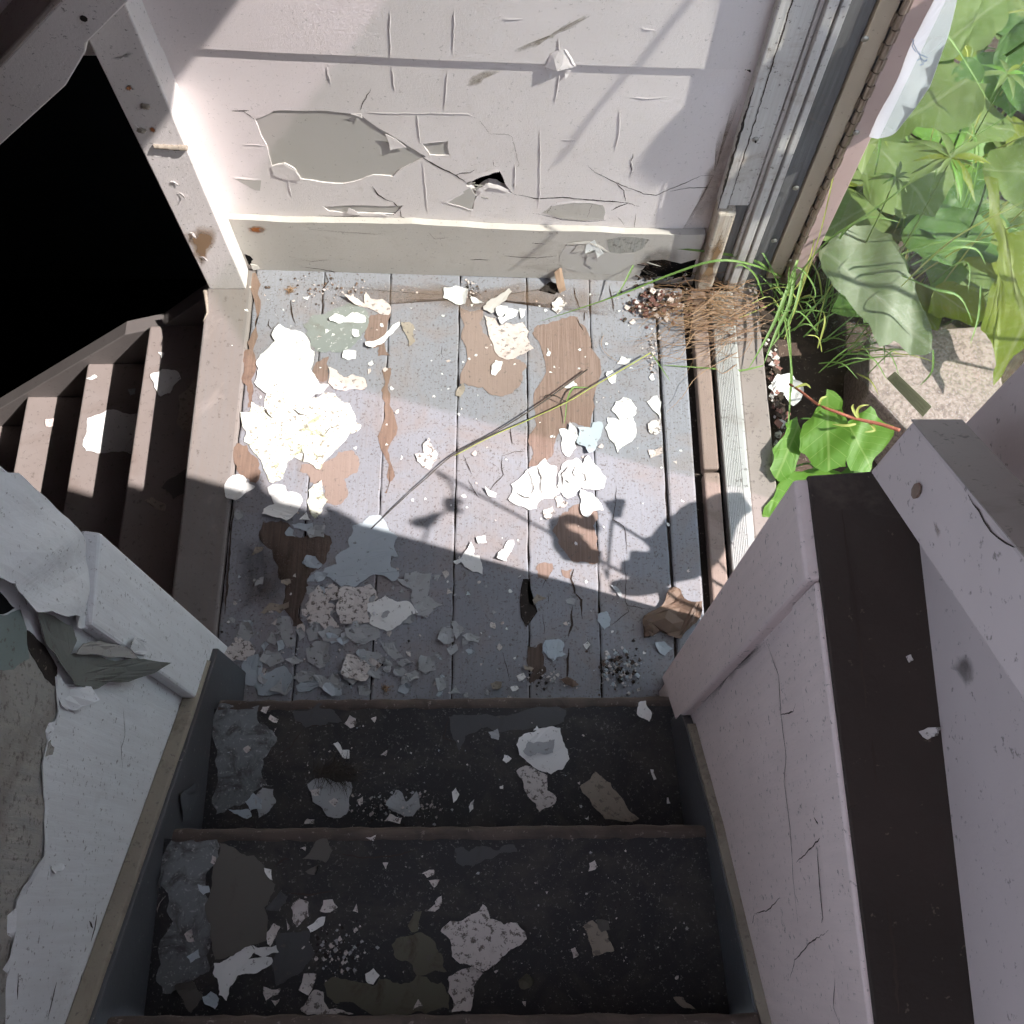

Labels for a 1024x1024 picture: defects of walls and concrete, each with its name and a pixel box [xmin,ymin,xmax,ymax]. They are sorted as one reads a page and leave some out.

peeling [256,110,449,183]
crack [360,10,709,239]
peeling [441,286,534,376]
peeling [240,324,388,538]
peeling [475,357,682,527]
crack [968,495,1014,547]
peeling [224,515,508,698]
crack [542,569,588,677]
peeling [516,722,570,812]
crack [752,642,824,976]
peeling [174,838,353,1015]
peeling [441,905,527,1012]